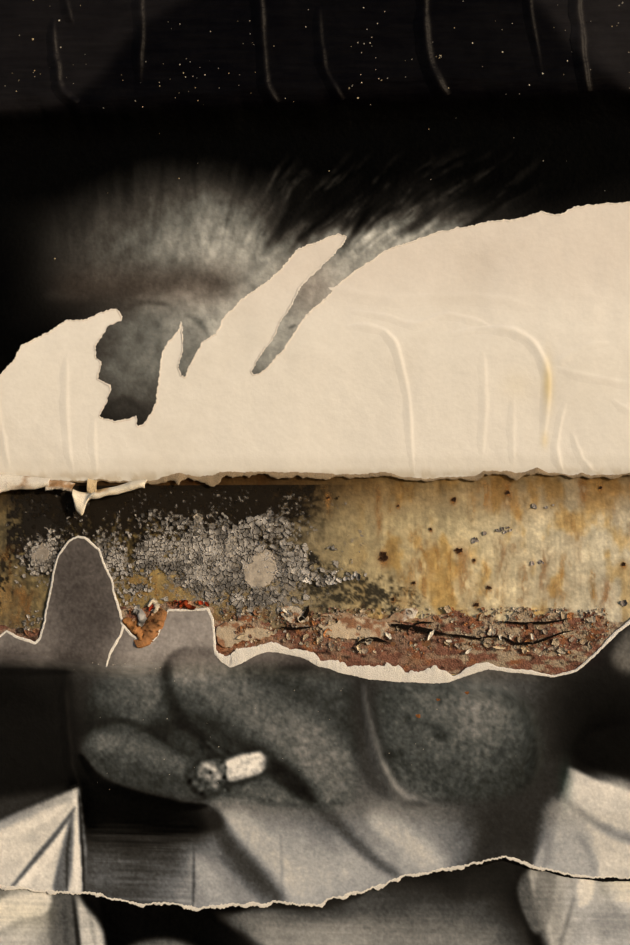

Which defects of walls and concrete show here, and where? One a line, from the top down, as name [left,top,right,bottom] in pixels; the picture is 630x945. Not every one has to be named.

peeling [14,488,436,648]
rust [0,625,41,642]
rust [120,584,624,675]